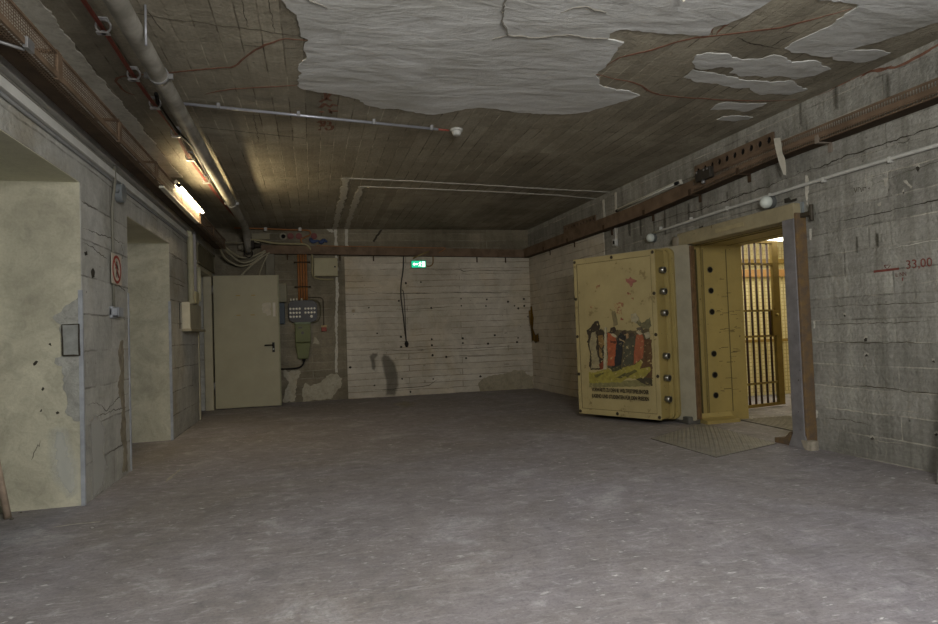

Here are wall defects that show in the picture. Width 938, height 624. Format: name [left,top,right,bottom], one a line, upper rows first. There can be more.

crack [492,0,608,40]
peeling [785,0,938,57]
peeling [282,0,771,115]
rust [819,44,938,95]